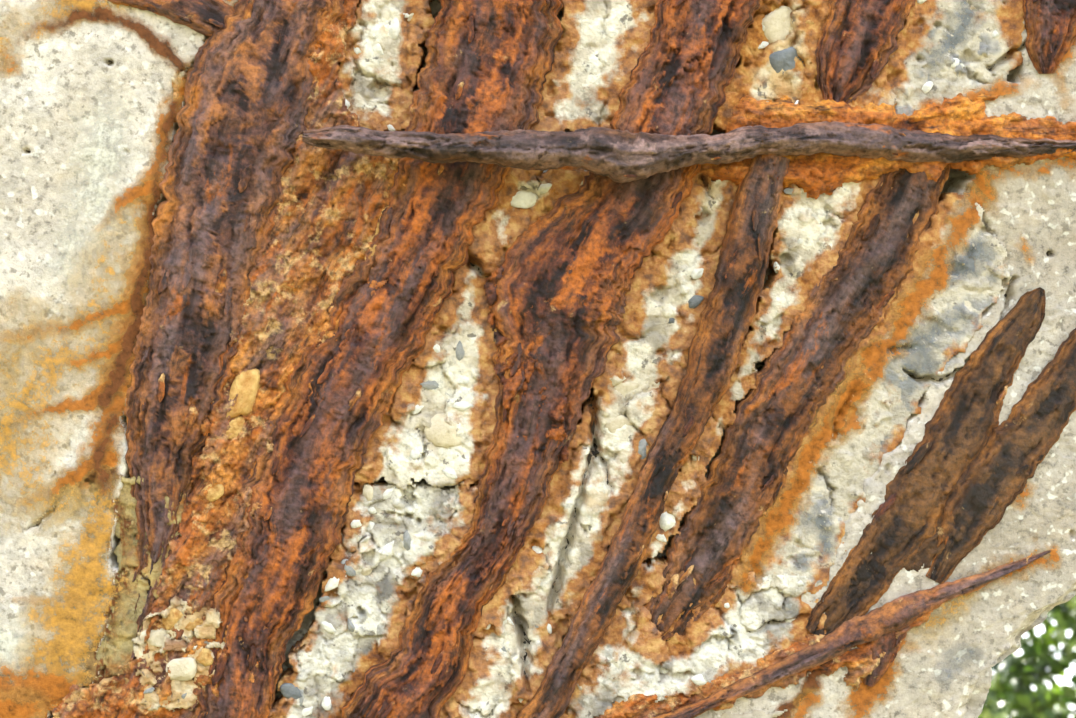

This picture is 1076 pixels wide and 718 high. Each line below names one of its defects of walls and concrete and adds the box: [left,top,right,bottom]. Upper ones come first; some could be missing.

spalling [337,0,435,131]
spalling [531,0,657,132]
spalling [847,0,1025,116]
corrosion [0,0,190,718]
corrosion [738,156,1076,594]
spalling [268,167,589,718]
spalling [439,169,738,718]
spalling [560,177,1012,718]
corrosion [666,565,694,598]
corrosion [208,649,227,686]
corrosion [774,669,823,718]
corrosion [846,635,907,718]